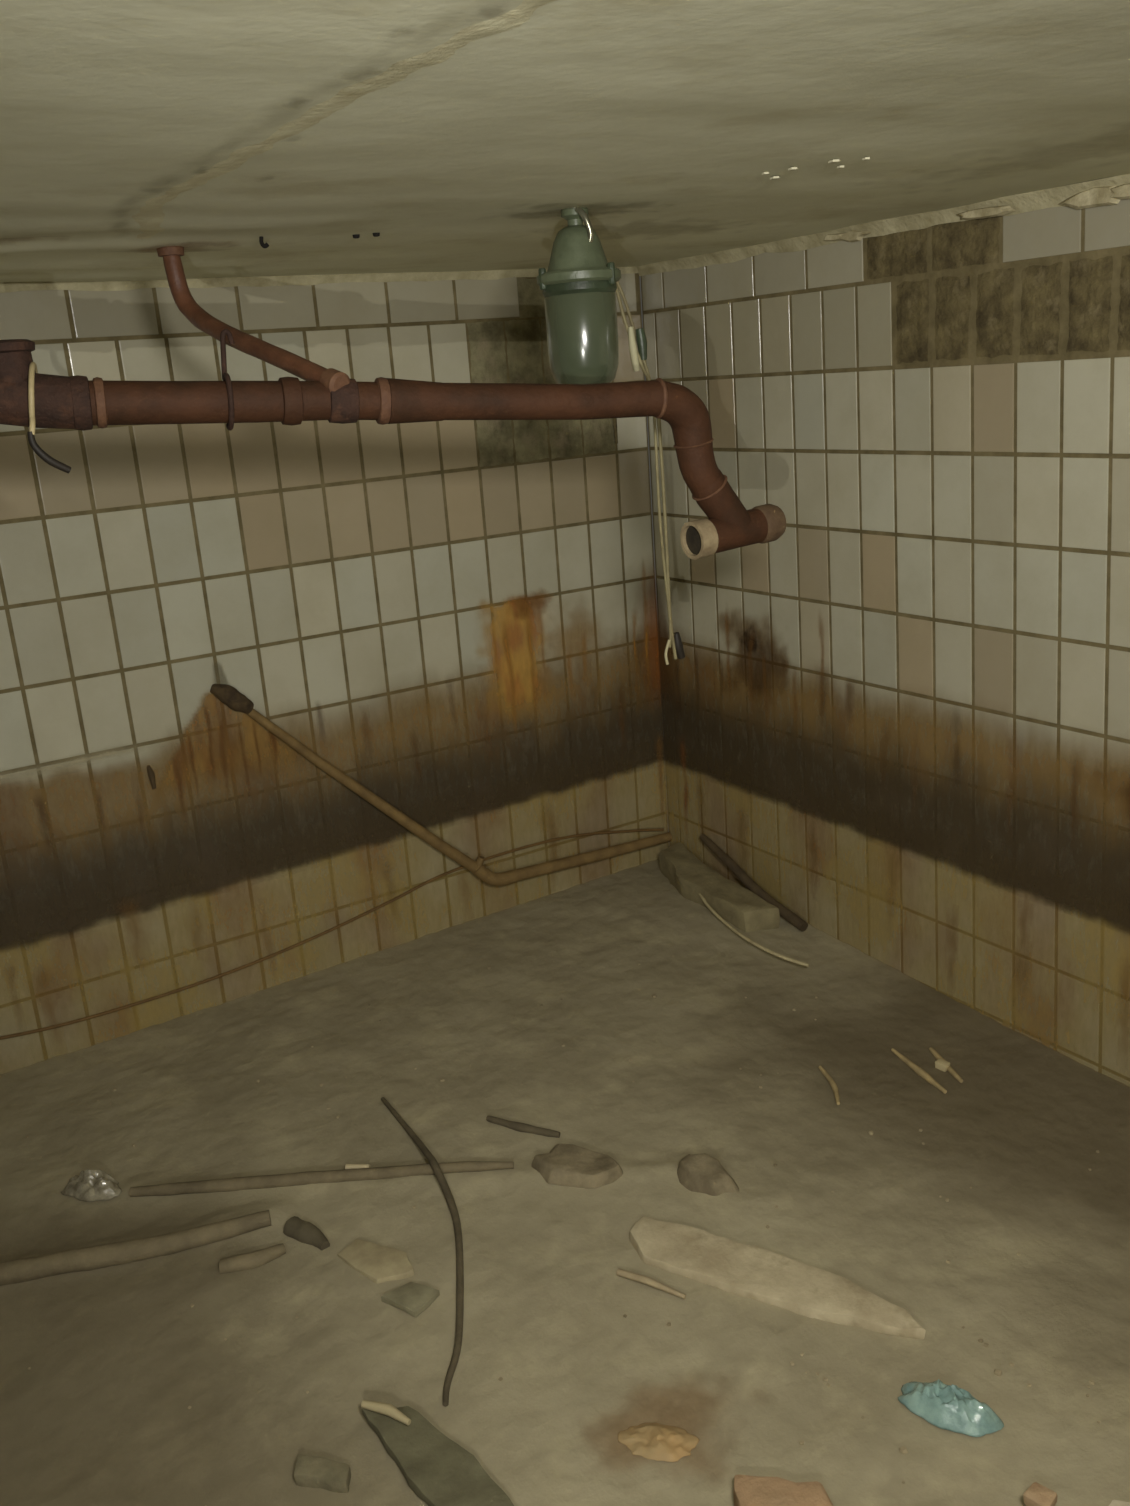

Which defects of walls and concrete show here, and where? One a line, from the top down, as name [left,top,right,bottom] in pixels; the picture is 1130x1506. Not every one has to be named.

crack [132,0,556,239]
rust [489,597,544,708]
rust [634,602,669,683]
rust [726,619,788,695]
rust [163,693,292,785]
leakage [0,640,1130,1062]